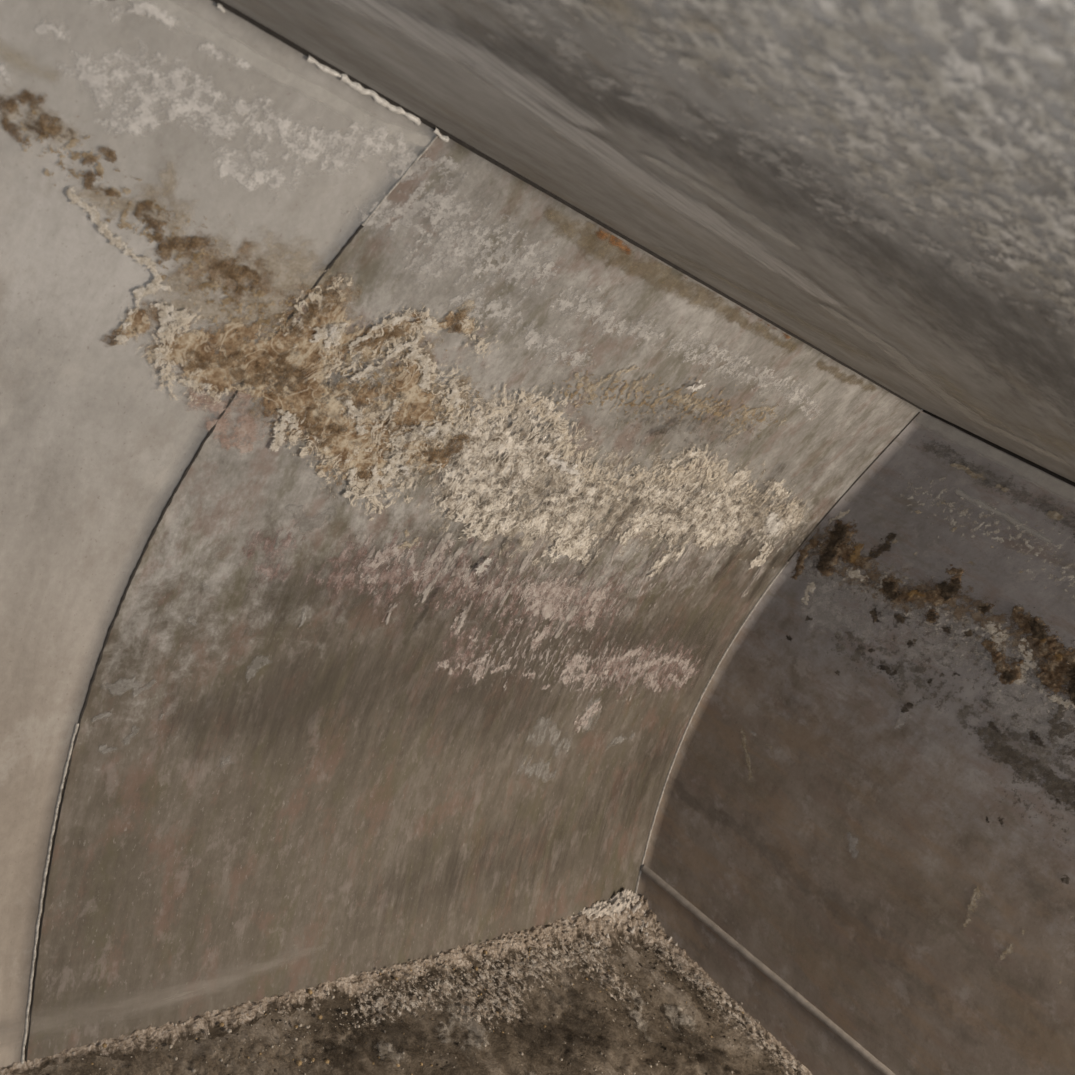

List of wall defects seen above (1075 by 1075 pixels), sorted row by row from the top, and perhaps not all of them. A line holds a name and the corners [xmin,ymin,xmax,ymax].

efflorescence [90,0,186,26]
efflorescence [18,50,820,781]